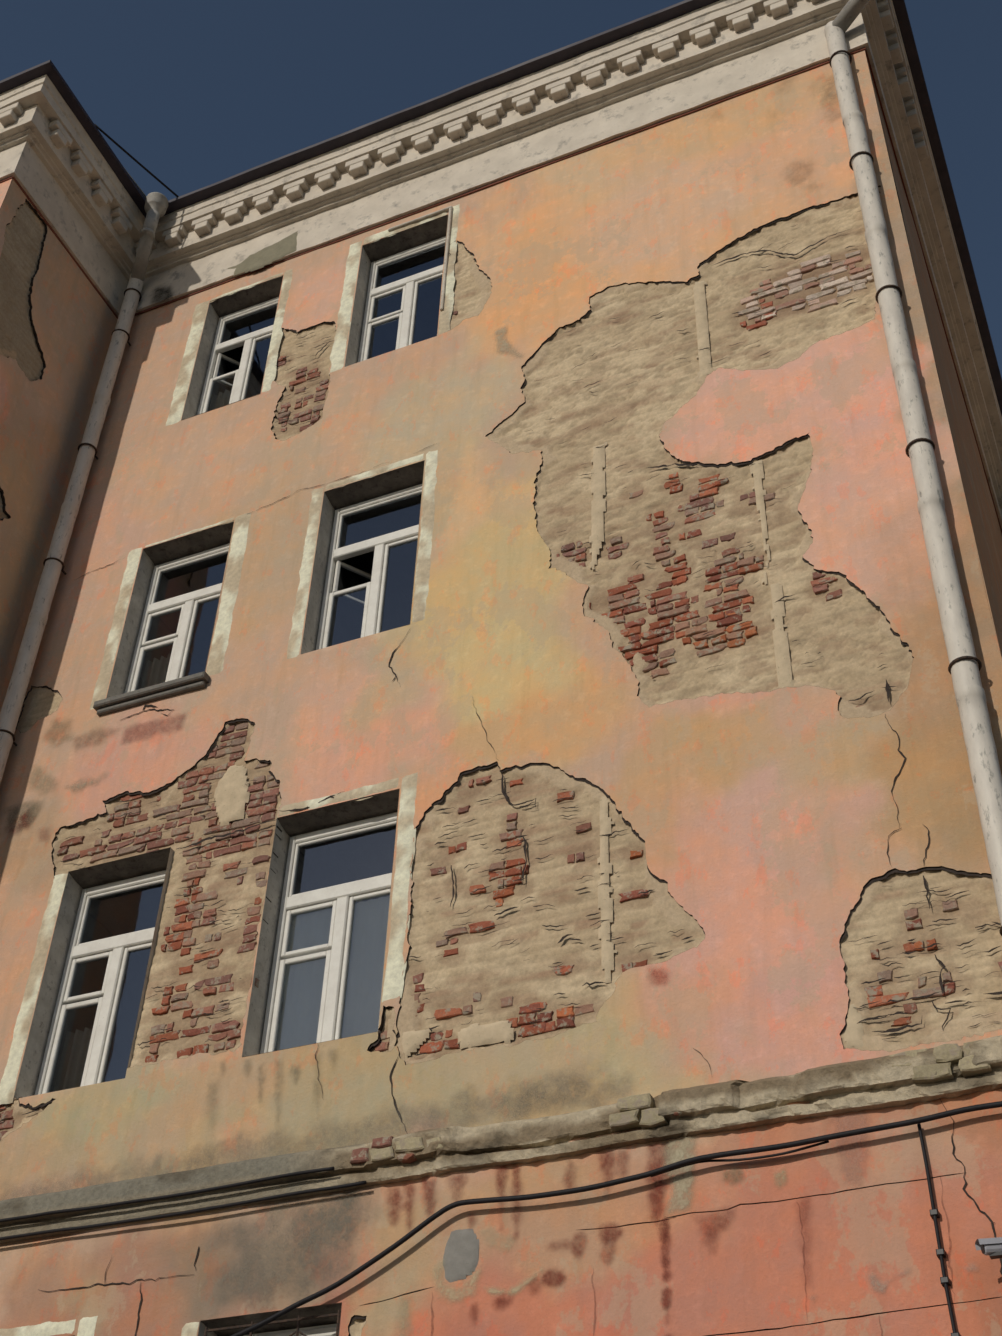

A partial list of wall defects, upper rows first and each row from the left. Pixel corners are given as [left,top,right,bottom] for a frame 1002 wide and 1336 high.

flaking render [450,240,492,330]
flaking render [271,321,336,441]
flaking render [486,193,914,718]
crack [388,629,410,683]
crack [885,714,930,865]
flaking render [51,718,282,1068]
flaking render [367,761,705,1065]
flaking render [839,866,1002,1052]
crack [389,1055,408,1134]
leakage [666,1137,695,1210]
crack [939,1098,1002,1275]
crack [41,1246,199,1336]